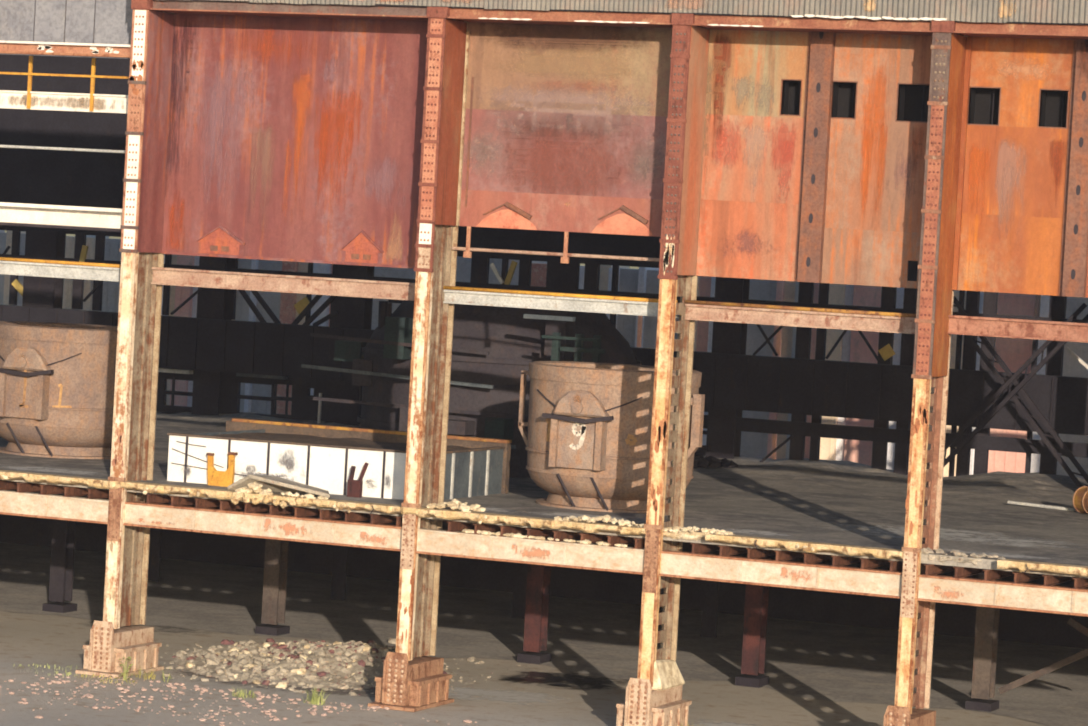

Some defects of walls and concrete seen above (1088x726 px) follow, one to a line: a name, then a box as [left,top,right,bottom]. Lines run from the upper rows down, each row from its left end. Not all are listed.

corrosion [713,36,730,129]